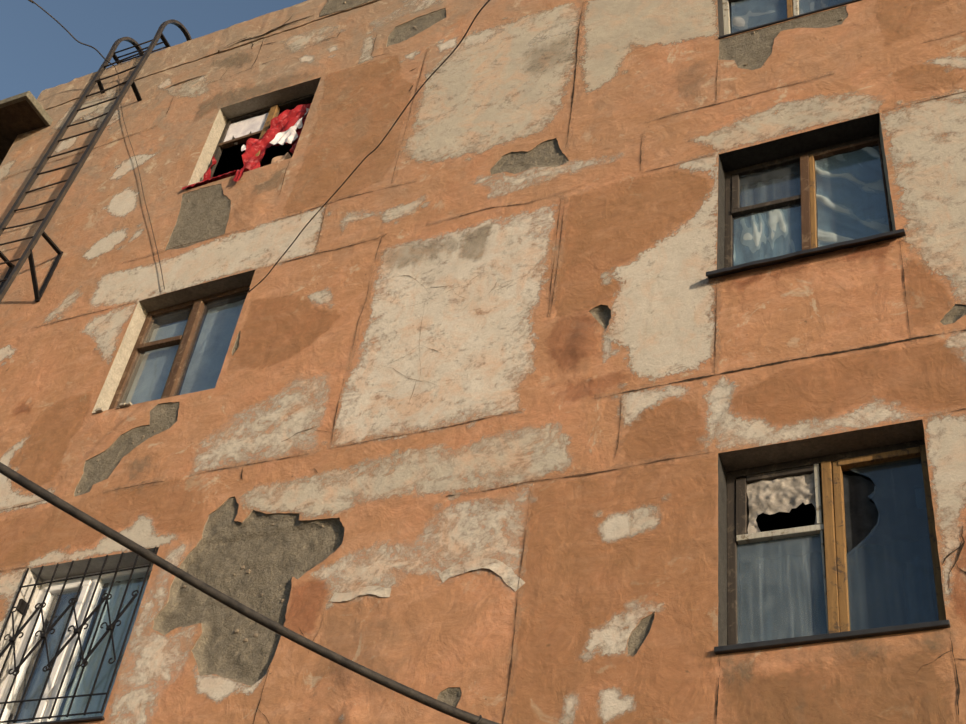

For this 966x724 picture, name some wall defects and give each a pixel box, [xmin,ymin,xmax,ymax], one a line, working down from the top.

peeling [285,26,343,63]
spalling [359,0,446,64]
peeling [402,0,848,198]
peeling [927,56,966,68]
crack [192,52,520,480]
peeling [589,88,966,424]
peeling [0,184,572,724]
crack [446,246,966,724]
peeling [581,602,664,661]